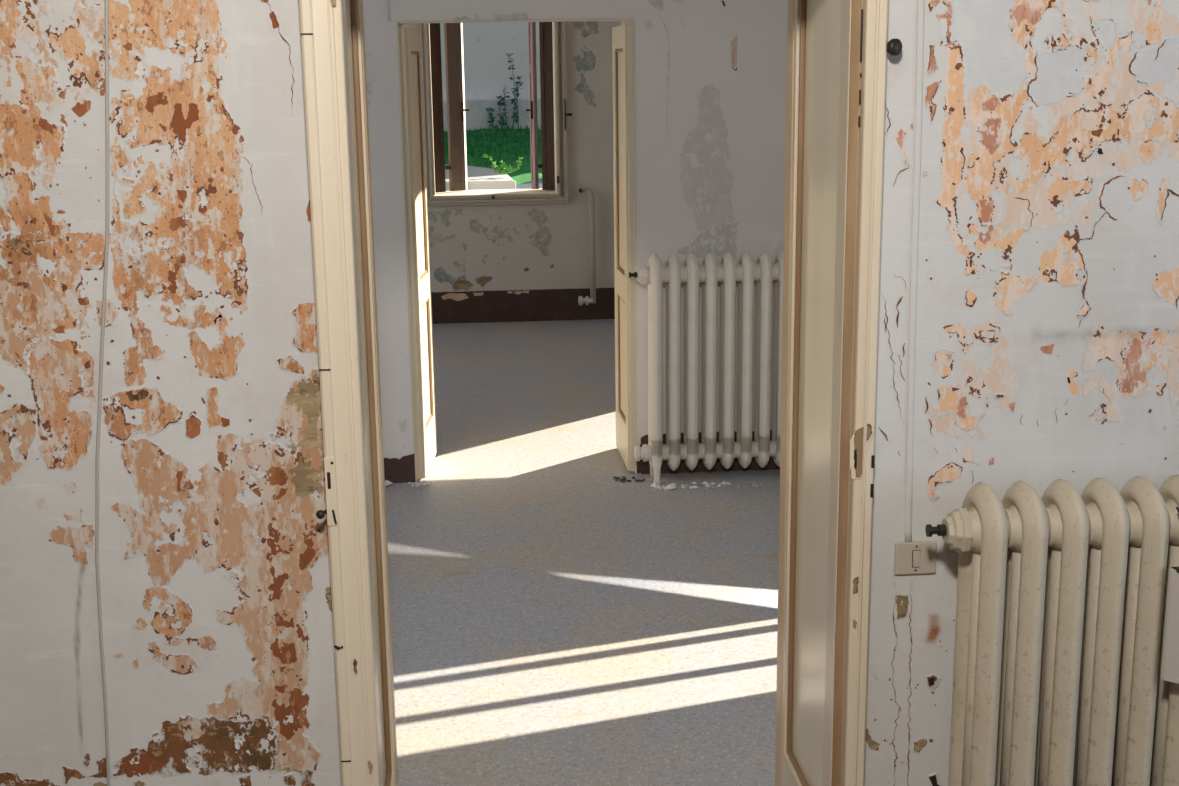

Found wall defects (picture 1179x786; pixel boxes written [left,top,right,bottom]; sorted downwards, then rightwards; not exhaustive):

crack [1084,0,1118,45]
crack [1027,50,1057,107]
crack [1129,39,1166,84]
crack [1160,189,1179,226]
peeling [428,207,554,301]
peeling [893,0,1179,502]
crack [1076,176,1126,328]
peeling [0,0,332,786]
peeling [895,594,910,620]
crack [875,579,915,786]
spalling [924,673,942,693]
spalling [926,772,942,786]